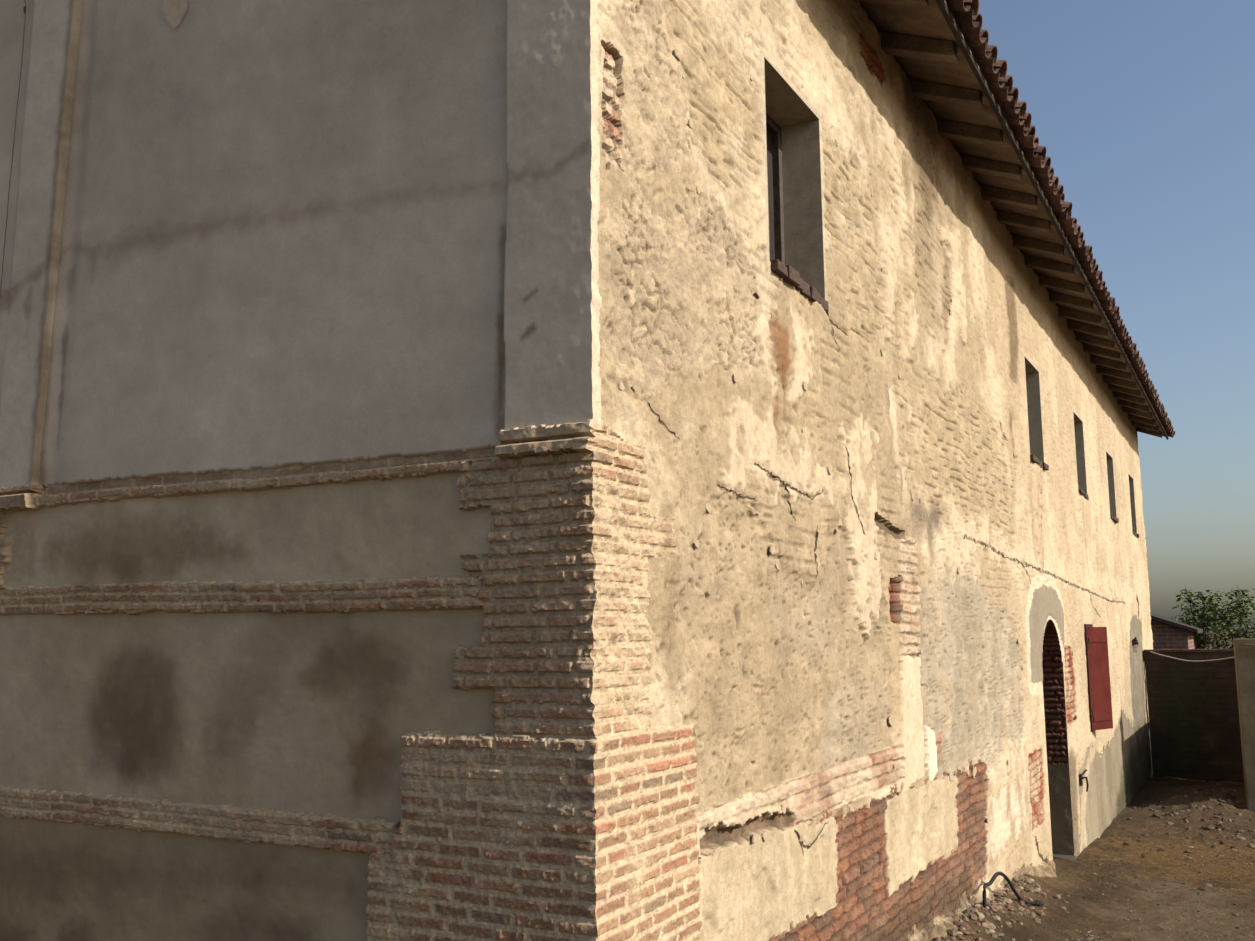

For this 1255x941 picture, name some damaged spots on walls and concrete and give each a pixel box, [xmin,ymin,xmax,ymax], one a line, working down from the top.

crack [716,448,865,578]